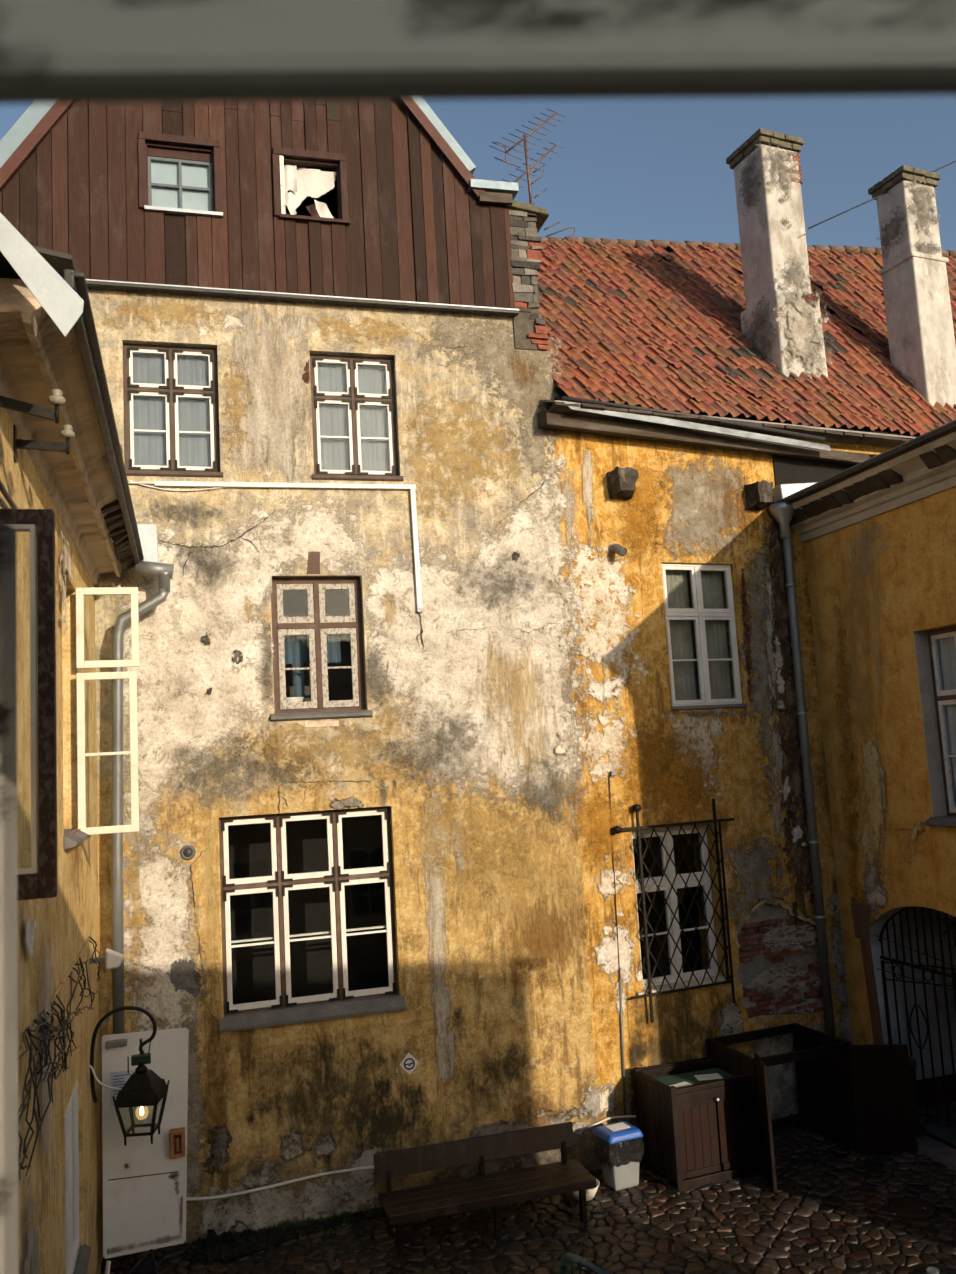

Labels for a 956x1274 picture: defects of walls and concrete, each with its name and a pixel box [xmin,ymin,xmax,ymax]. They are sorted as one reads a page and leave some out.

crack [157,510,276,578]
peeling [106,311,653,1032]
water stain [761,499,879,930]
peeling [859,730,887,921]
spalling [719,891,852,1049]
spalling [203,1125,232,1177]
spalling [241,1129,338,1188]
mould [247,1043,431,1156]